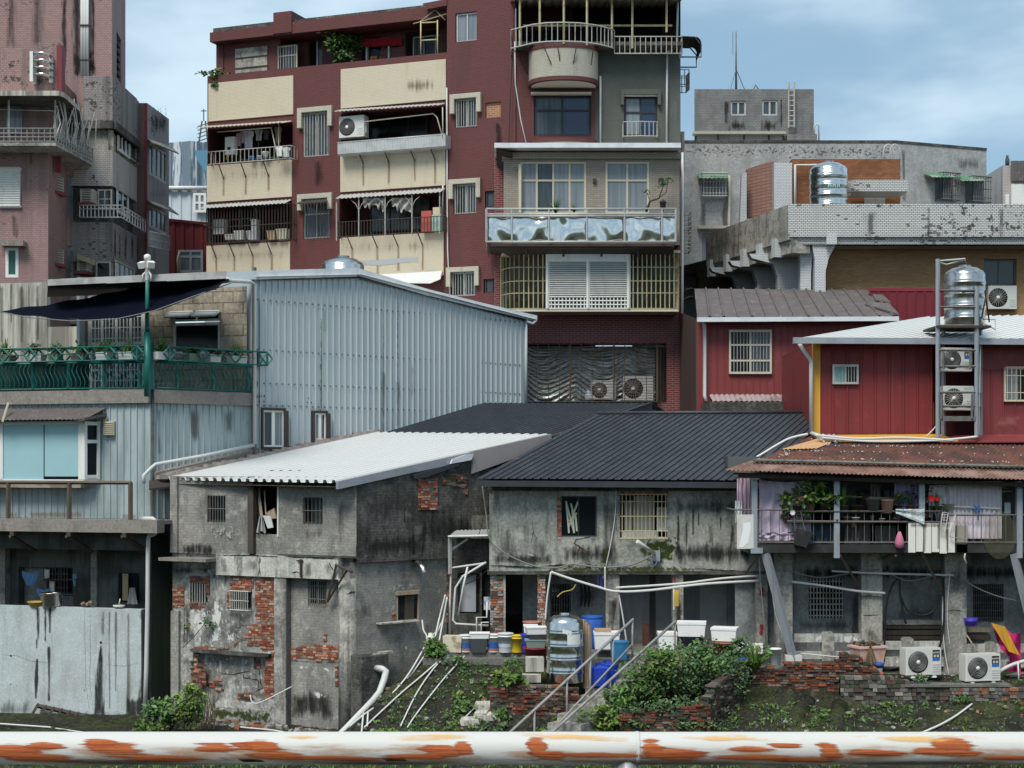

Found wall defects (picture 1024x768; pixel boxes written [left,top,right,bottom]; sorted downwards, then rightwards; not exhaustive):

peeling [919,204,1024,241]
flaking render [418,473,468,510]
water stain [566,507,615,563]
water stain [675,503,750,562]
flaking render [172,576,210,609]
water stain [34,608,51,700]
water stain [94,646,110,715]
water stain [126,667,144,715]
flaking render [190,575,274,709]
flaking render [291,634,338,686]
rust [0,734,474,765]
rust [514,735,1024,765]